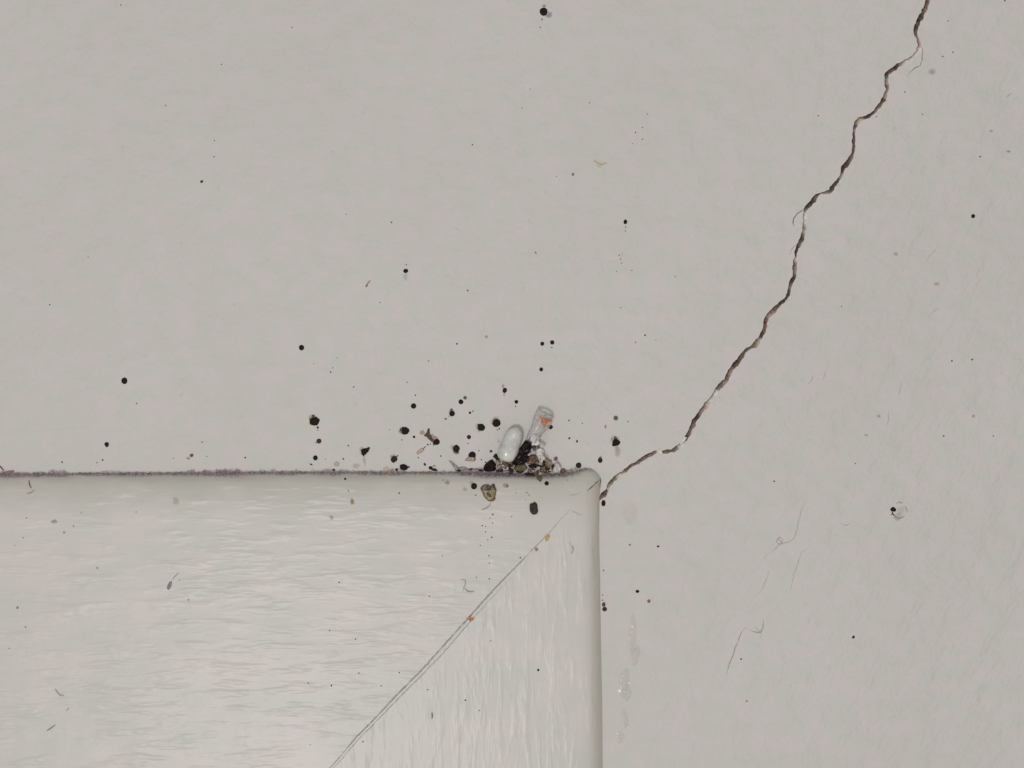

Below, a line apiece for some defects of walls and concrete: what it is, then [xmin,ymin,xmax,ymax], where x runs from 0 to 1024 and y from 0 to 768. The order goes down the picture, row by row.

crack [599,0,930,501]